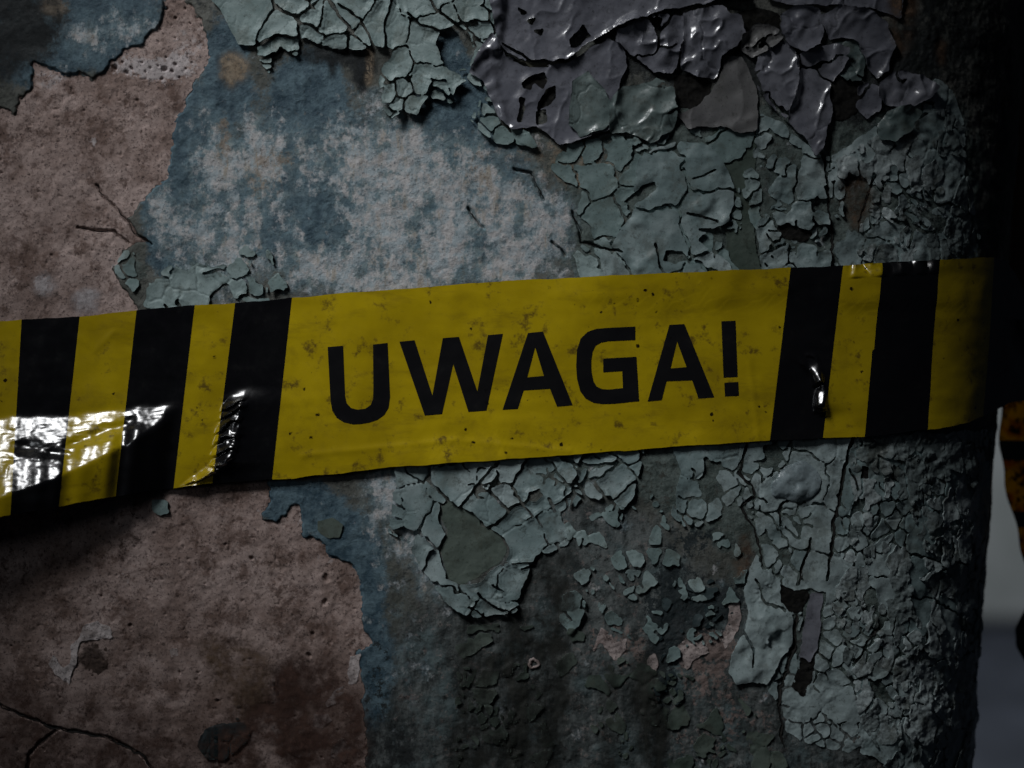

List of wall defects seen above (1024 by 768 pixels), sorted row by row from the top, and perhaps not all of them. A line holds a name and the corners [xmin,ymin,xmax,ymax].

crack [82,185,150,242]
spalling [0,0,288,321]
peeling [212,0,981,277]
crack [0,705,151,768]
spalling [0,480,373,768]
peeling [388,429,994,768]